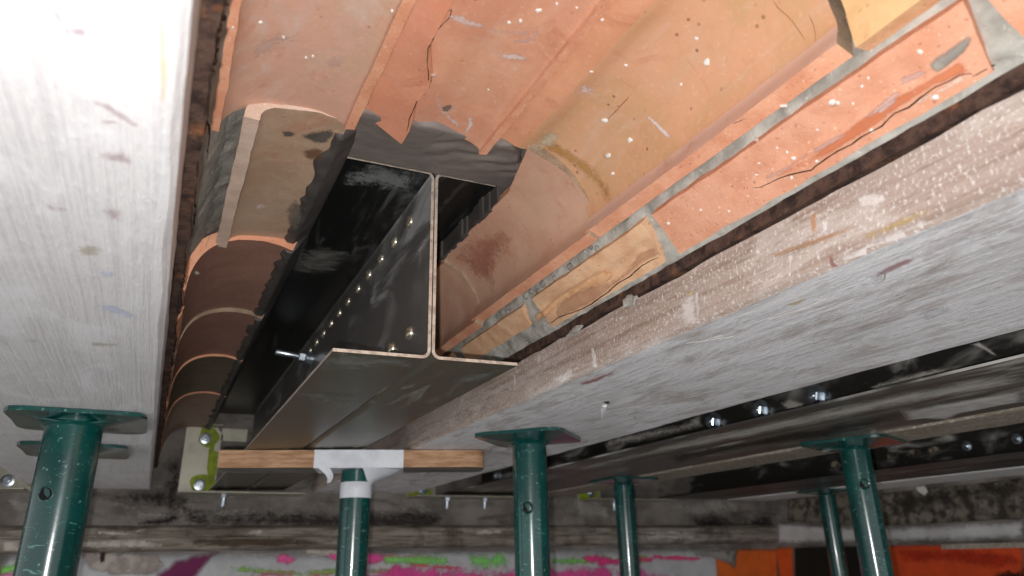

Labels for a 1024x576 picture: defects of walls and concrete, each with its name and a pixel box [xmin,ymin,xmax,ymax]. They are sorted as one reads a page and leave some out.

crack [407,9,452,130]
crack [758,64,996,188]
crack [546,254,664,325]